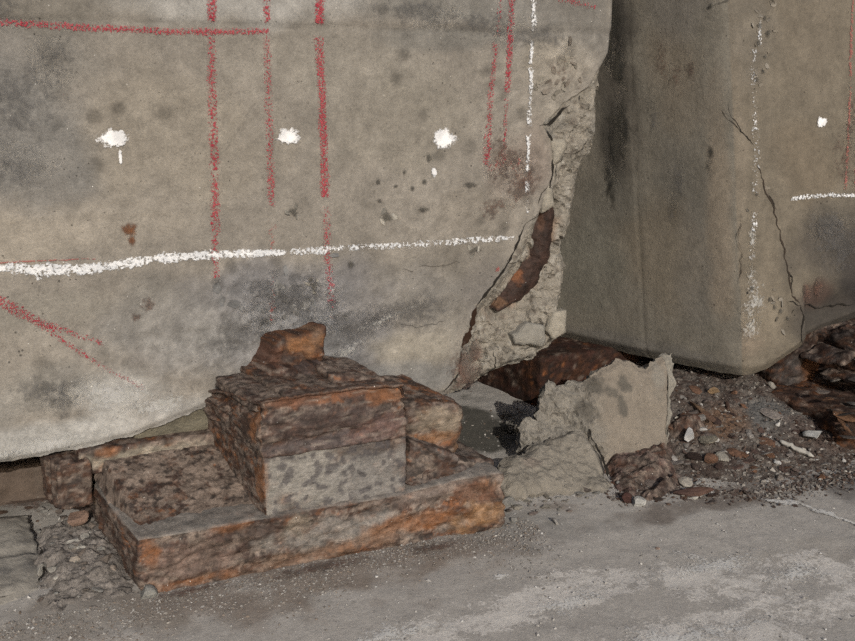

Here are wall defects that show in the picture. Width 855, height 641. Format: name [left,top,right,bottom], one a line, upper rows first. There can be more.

damp [607,0,624,80]
spalling [447,36,599,394]
crack [758,167,853,345]